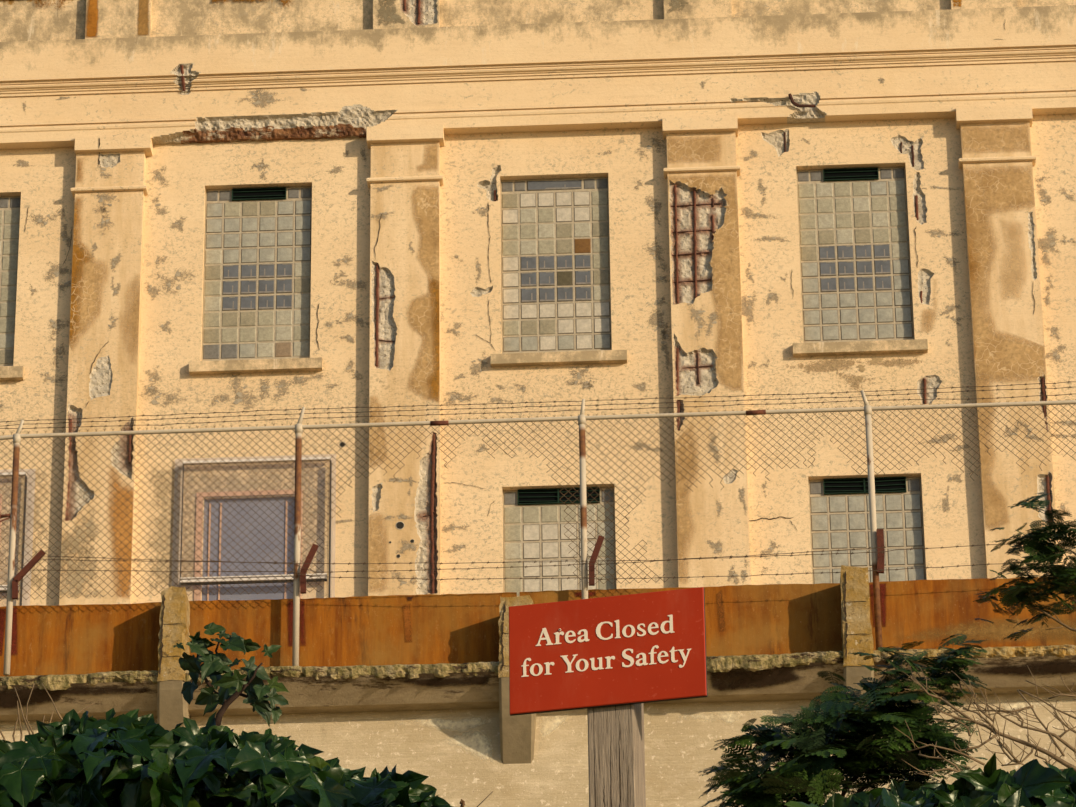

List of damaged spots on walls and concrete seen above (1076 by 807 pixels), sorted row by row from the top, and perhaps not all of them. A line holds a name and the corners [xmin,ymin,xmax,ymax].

damp [138,0,149,35]
damp [69,247,106,349]
spalling [152,88,398,174]
spalling [325,255,397,371]
damp [409,186,440,399]
spalling [634,180,727,431]
spalling [891,134,958,237]
damp [964,168,1045,528]
spalling [1028,177,1076,305]
spalling [65,355,113,521]
spalling [110,417,134,479]
spalling [371,432,469,594]